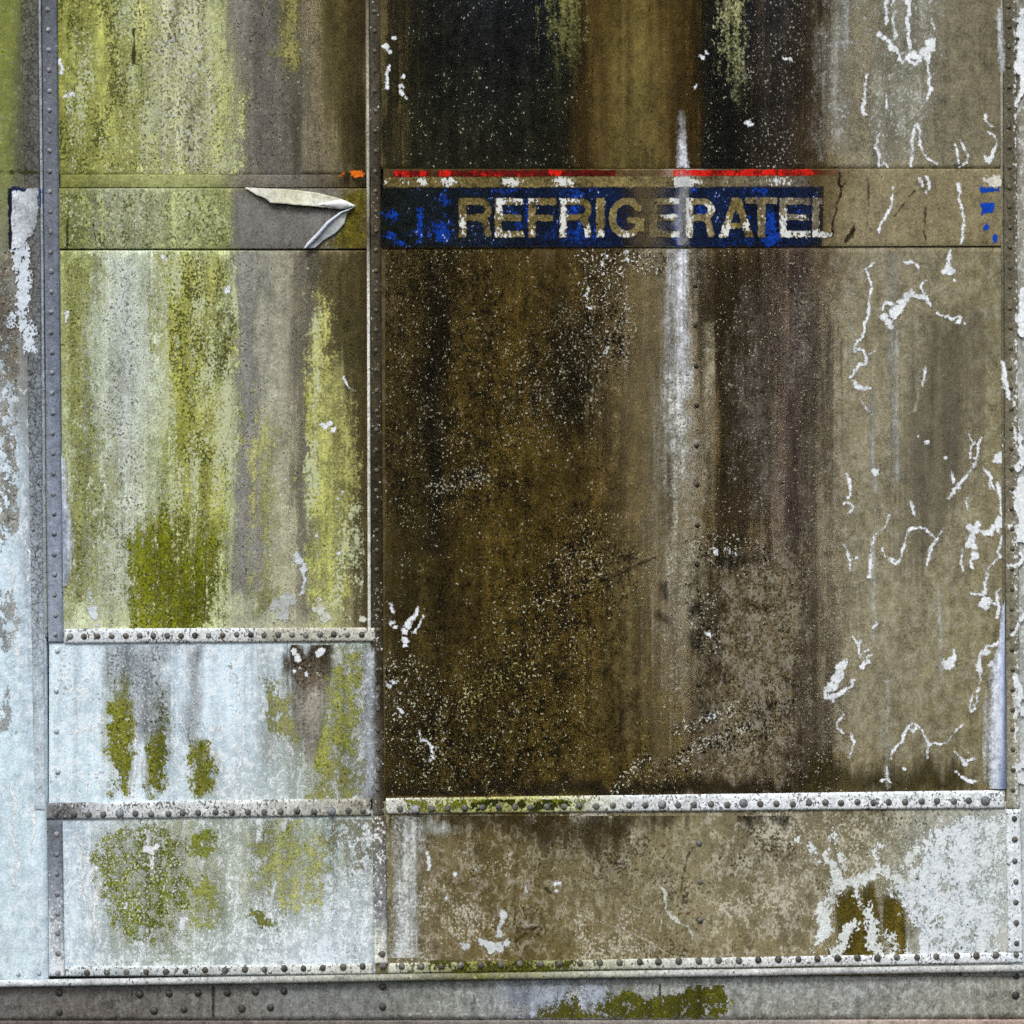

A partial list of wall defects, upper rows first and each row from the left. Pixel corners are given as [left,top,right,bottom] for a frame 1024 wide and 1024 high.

leakage [58,0,310,174]
leakage [322,0,367,187]
peeling [876,0,936,100]
peeling [230,170,366,249]
peeling [6,242,38,355]
peeling [849,259,966,412]
leakage [61,251,283,628]
leakage [291,251,367,627]
leakage [361,249,975,799]
peeling [944,426,1024,619]
leakage [101,645,172,800]
peeling [794,816,1006,956]